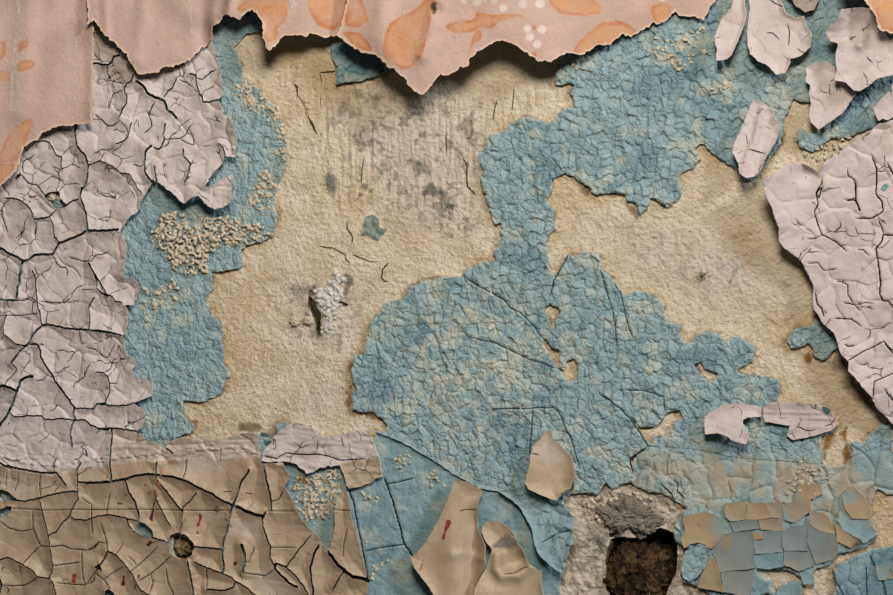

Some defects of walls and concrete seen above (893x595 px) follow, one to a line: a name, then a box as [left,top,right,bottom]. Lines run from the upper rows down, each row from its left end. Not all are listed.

peeling [0,10,288,595]
crack [0,21,414,595]
water stain [293,270,352,338]
peeling [259,0,893,595]
crack [796,156,893,401]